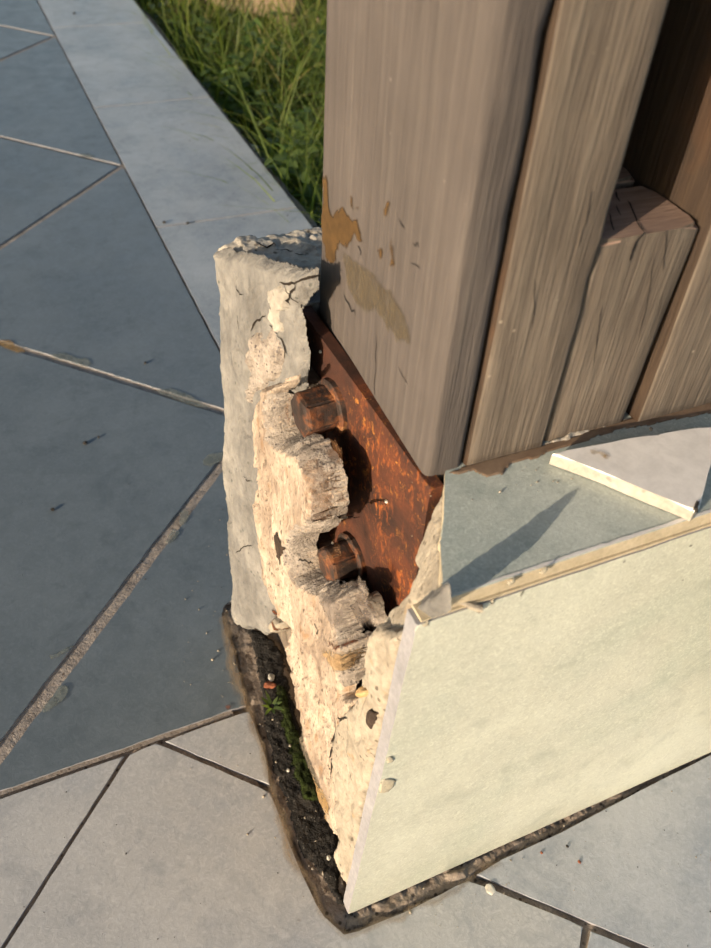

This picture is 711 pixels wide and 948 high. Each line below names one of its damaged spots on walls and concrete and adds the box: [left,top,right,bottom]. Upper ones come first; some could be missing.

spalling [245,285,387,835]
peeling [379,778,396,793]